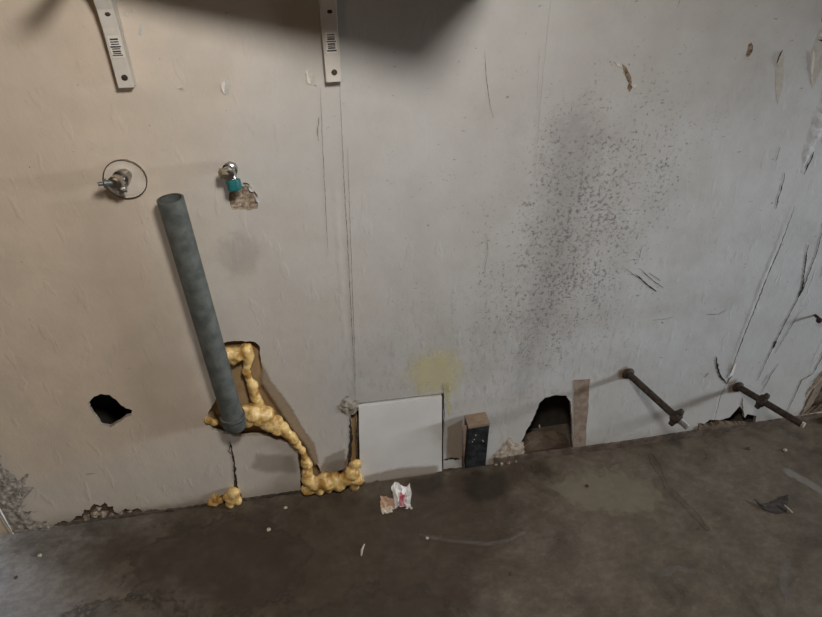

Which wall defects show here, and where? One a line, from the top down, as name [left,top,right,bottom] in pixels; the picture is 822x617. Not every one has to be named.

peeling [615,62,637,92]
spalling [229,182,259,208]
crack [704,148,822,412]
crack [228,441,236,487]
spalling [0,455,63,534]